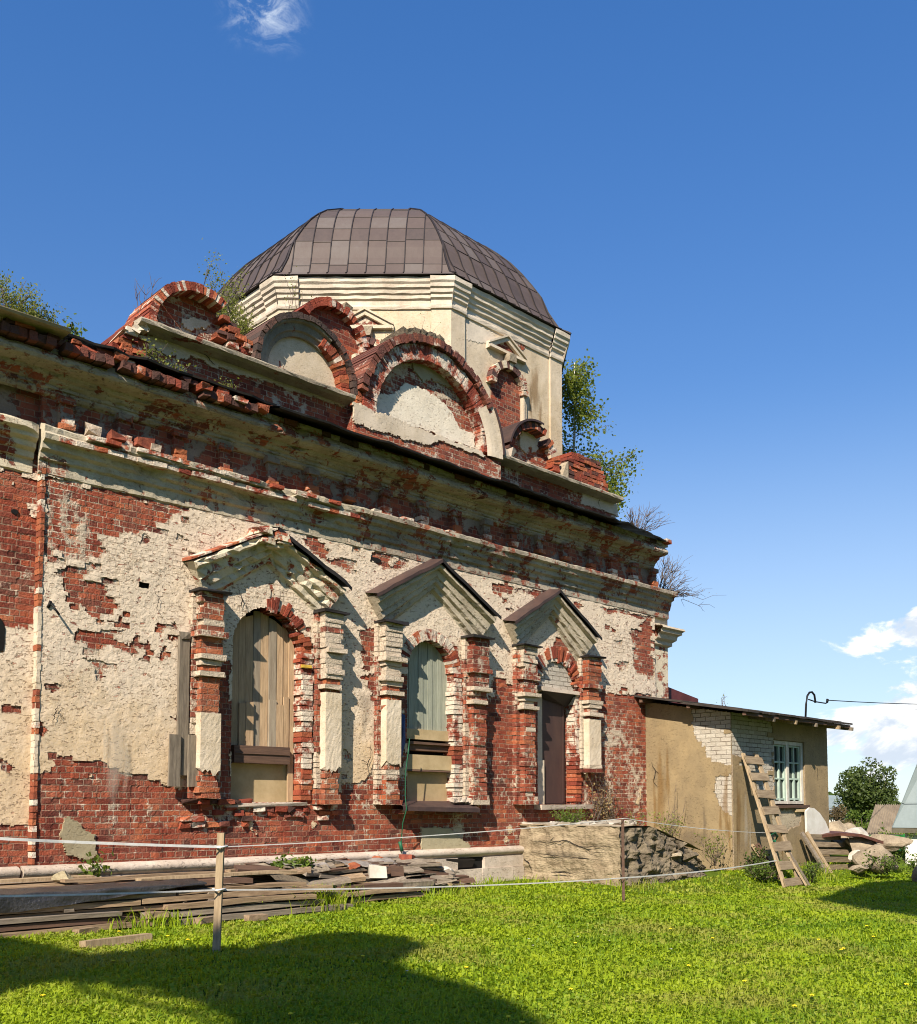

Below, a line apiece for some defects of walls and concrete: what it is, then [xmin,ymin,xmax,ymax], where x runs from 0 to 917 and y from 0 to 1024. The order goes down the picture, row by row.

spalling [0,466,196,681]
spalling [0,627,651,868]
spalling [600,606,655,680]
spalling [691,709,774,816]